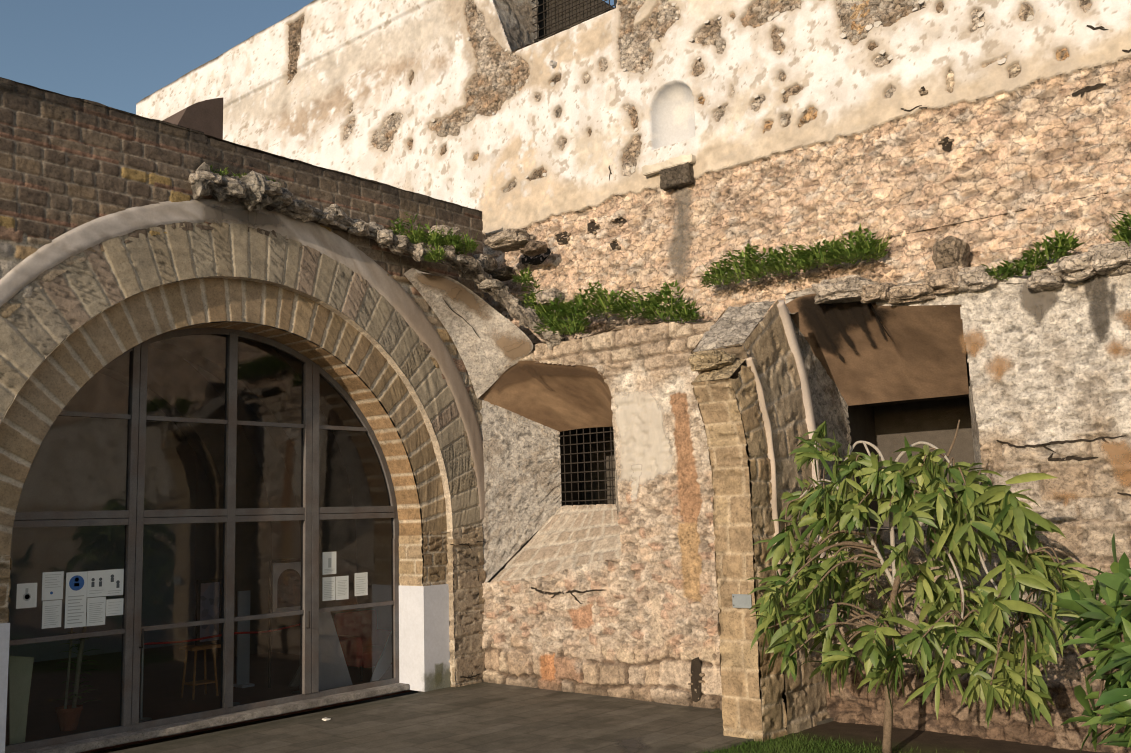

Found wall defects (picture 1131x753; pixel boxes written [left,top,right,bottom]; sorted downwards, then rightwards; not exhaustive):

spalling [287,15,305,85]
spalling [428,0,561,156]
spalling [583,0,681,84]
spalling [689,0,802,77]
spalling [820,0,944,68]
spalling [371,112,403,152]
water stain [797,296,890,363]
water stain [1021,282,1057,323]
water stain [1085,274,1116,341]
crack [531,586,605,604]